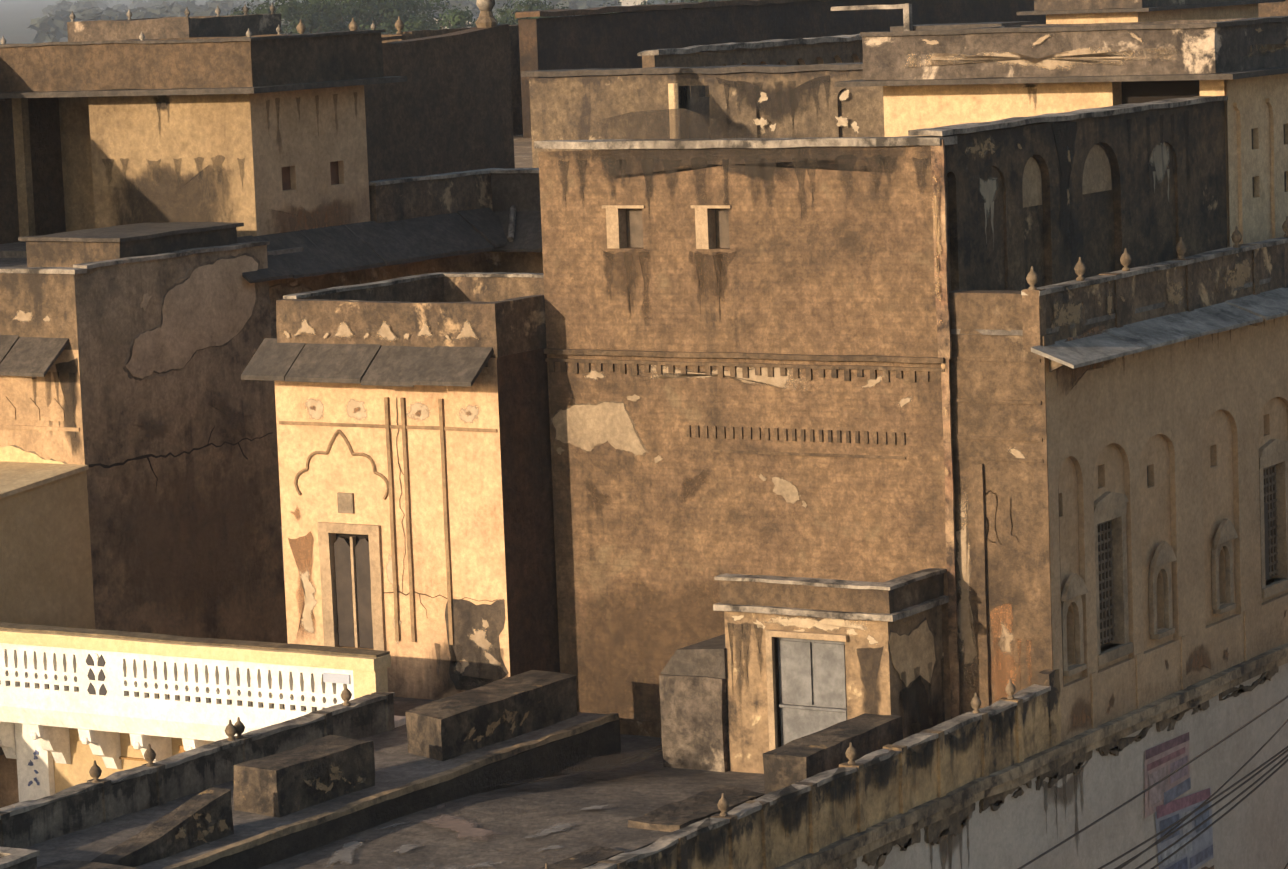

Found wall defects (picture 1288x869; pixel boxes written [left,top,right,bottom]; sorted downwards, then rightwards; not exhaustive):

leakage [115,167,228,225]
flaking render [123,252,476,381]
flaking render [0,445,67,464]
crack [88,426,273,489]
flaking render [551,394,663,464]
flaking render [445,599,508,691]
flaking render [732,615,944,699]
leakage [856,646,884,715]
leakage [779,785,806,830]
leakage [870,705,1017,788]
flaking render [833,667,1279,869]
leakage [1042,761,1088,845]